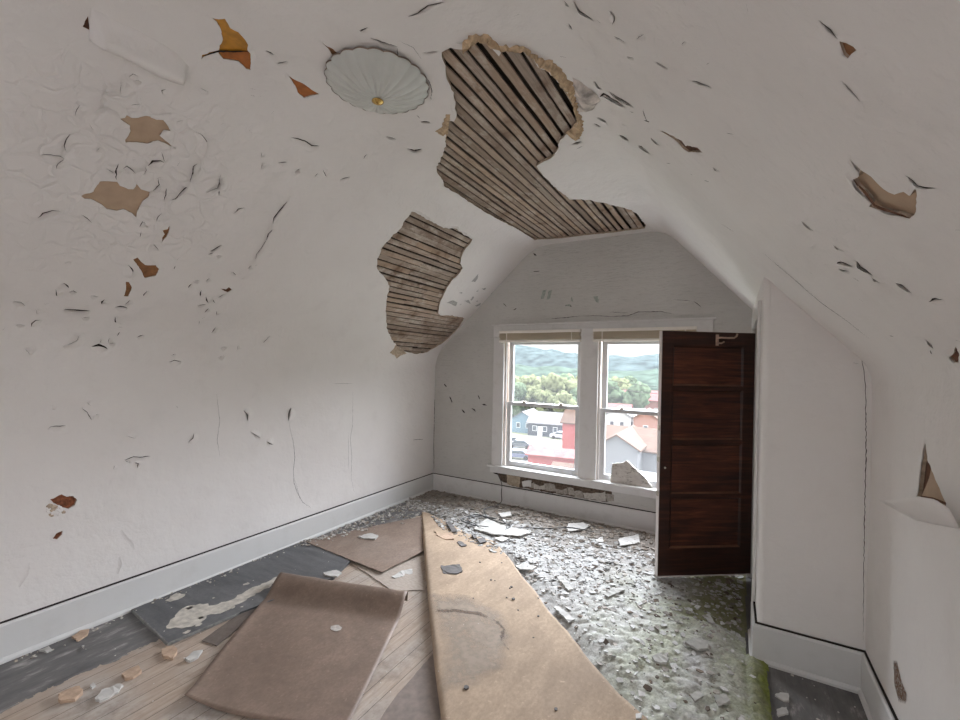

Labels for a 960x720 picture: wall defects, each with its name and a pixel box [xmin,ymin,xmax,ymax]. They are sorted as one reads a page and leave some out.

peeling [197,13,322,100]
flaking render [438,44,462,122]
peeling [118,111,178,149]
flaking render [434,134,595,241]
flaking render [537,135,649,230]
peeling [845,154,924,223]
peeling [63,157,203,355]
flaking render [375,210,492,355]
flaking render [46,492,81,517]
crack [288,408,305,504]
flaking render [494,473,614,502]
peeling [880,439,958,529]